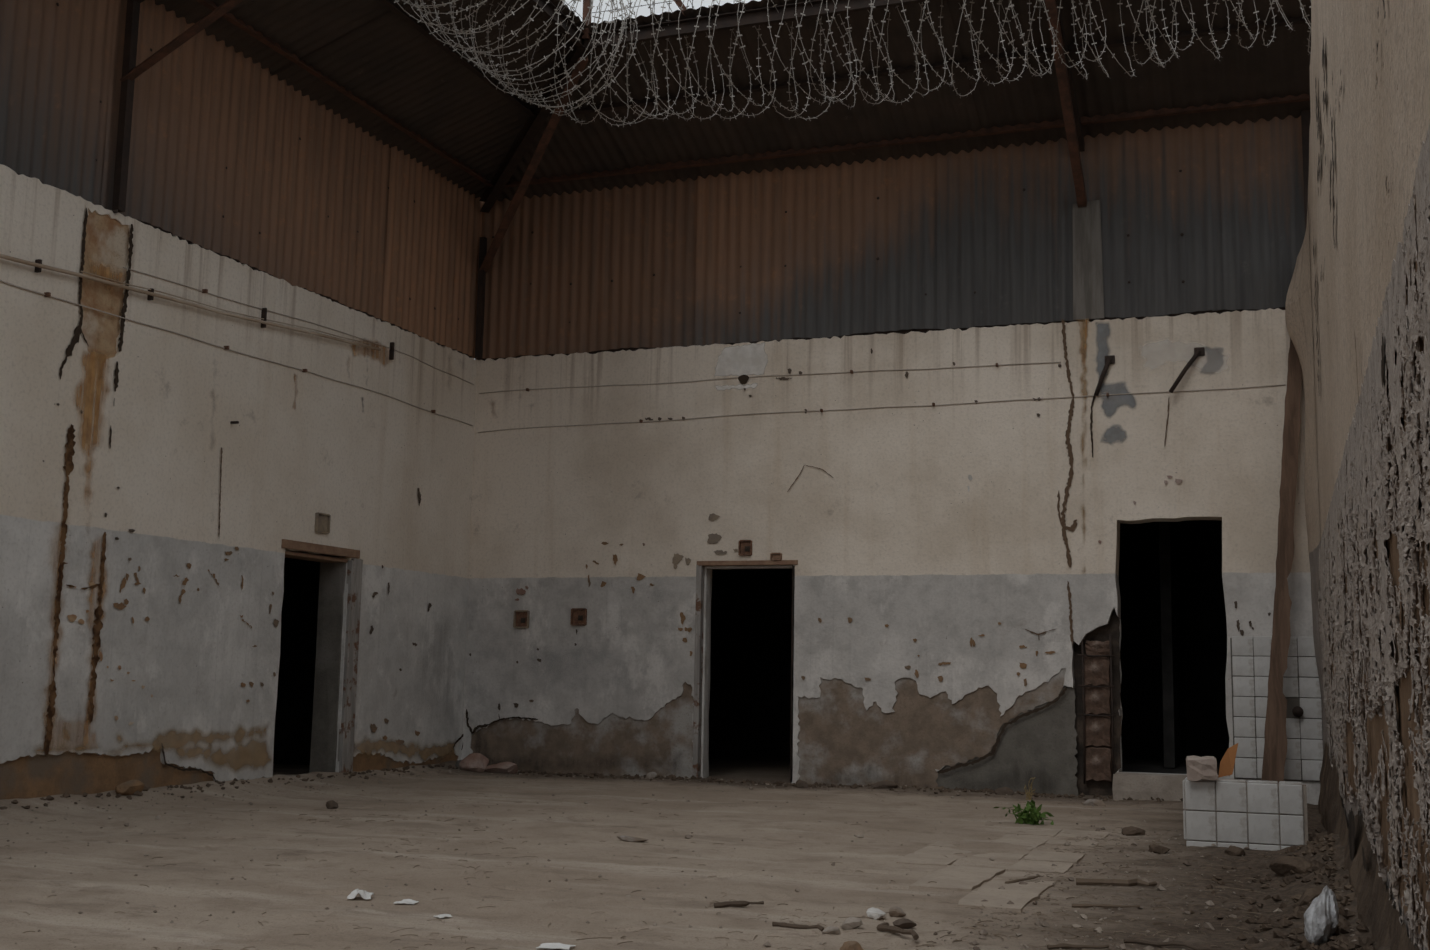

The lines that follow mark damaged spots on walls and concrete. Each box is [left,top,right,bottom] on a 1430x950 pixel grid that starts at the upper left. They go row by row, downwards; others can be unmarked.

flaking render [1313,36,1342,312]
rust [76,352,107,473]
crack [1025,319,1096,642]
peeling [1318,123,1430,950]
flaking render [0,748,214,800]
flaking render [353,682,694,778]
flaking render [797,609,1122,796]
crack [938,687,1067,773]